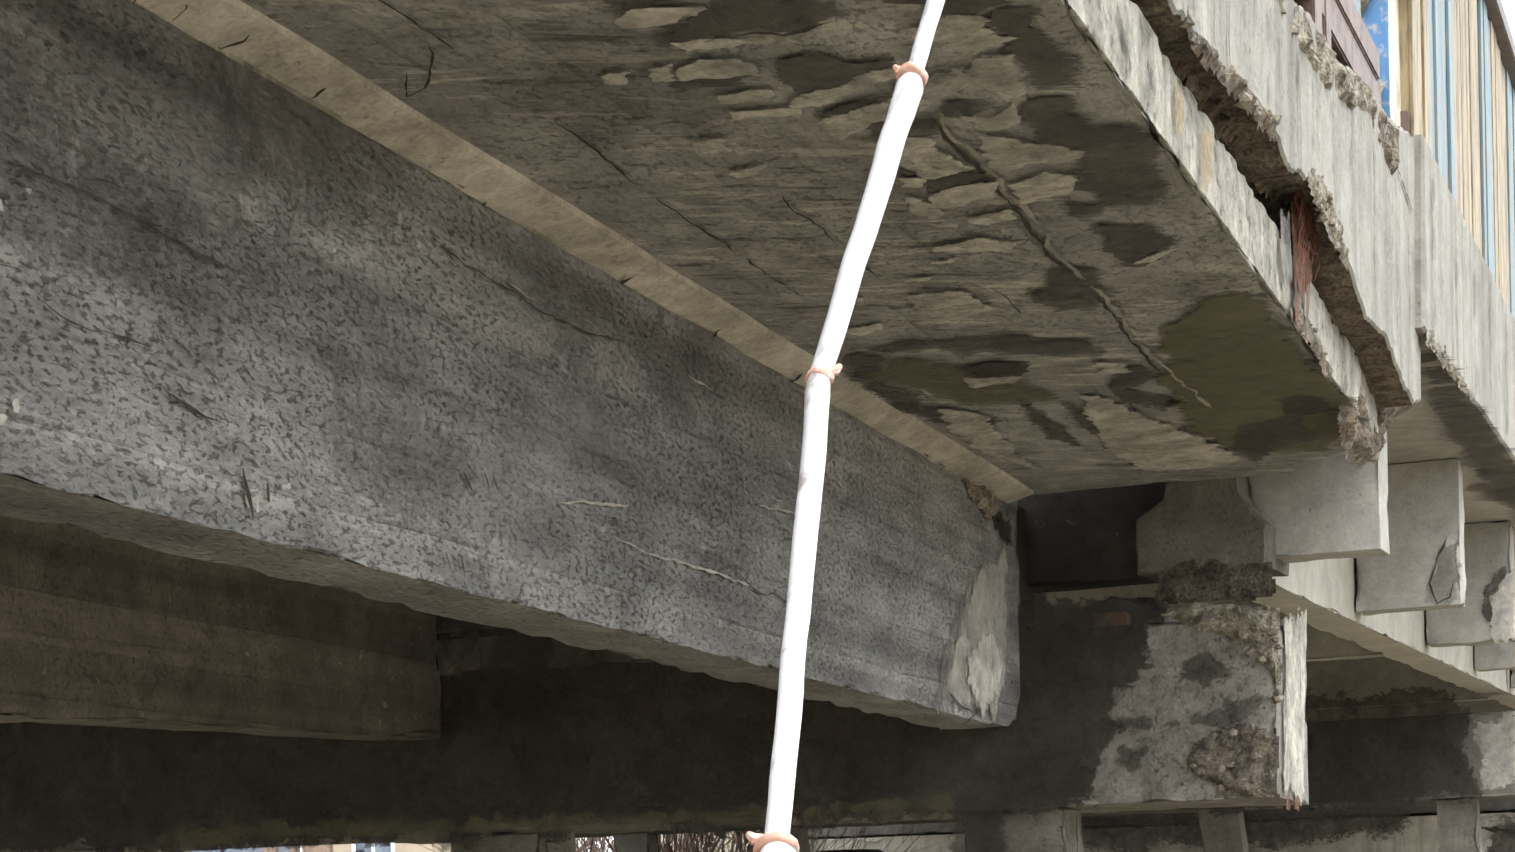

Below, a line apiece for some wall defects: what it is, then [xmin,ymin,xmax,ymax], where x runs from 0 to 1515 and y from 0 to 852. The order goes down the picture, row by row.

crack [433,238,626,343]
damp [667,53,896,119]
damp [841,332,1106,446]
peeling [894,15,1086,321]
crack [931,116,1065,269]
damp [883,0,1178,268]
crack [1098,300,1161,373]
spalling [1147,6,1282,159]
damp [1108,291,1370,461]
corrosion [1291,190,1320,323]
spalling [1278,0,1400,175]
spalling [1155,559,1307,803]